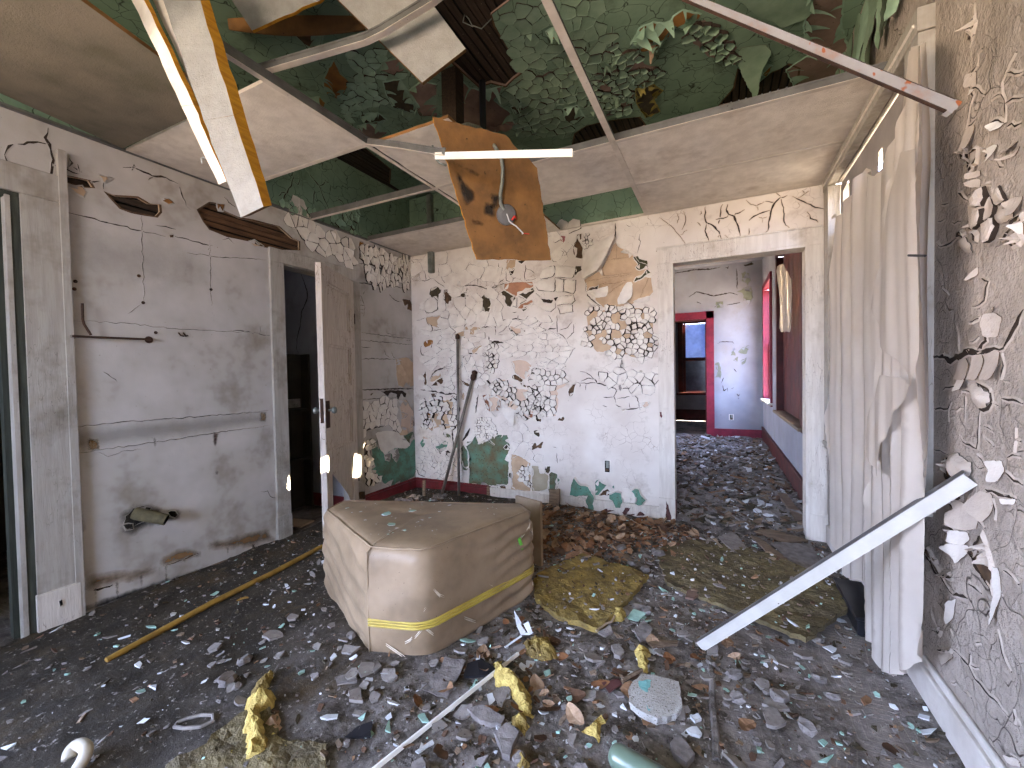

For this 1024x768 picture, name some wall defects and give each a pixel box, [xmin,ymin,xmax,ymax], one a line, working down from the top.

peeling [310,48,438,191]
peeling [435,0,846,145]
peeling [956,15,978,42]
peeling [963,71,977,96]
crack [2,127,270,336]
crack [614,190,824,254]
peeling [953,121,1024,250]
peeling [197,195,663,516]
peeling [952,351,1000,391]
peeling [970,307,1002,337]
peeling [936,454,952,480]
peeling [924,460,1016,625]